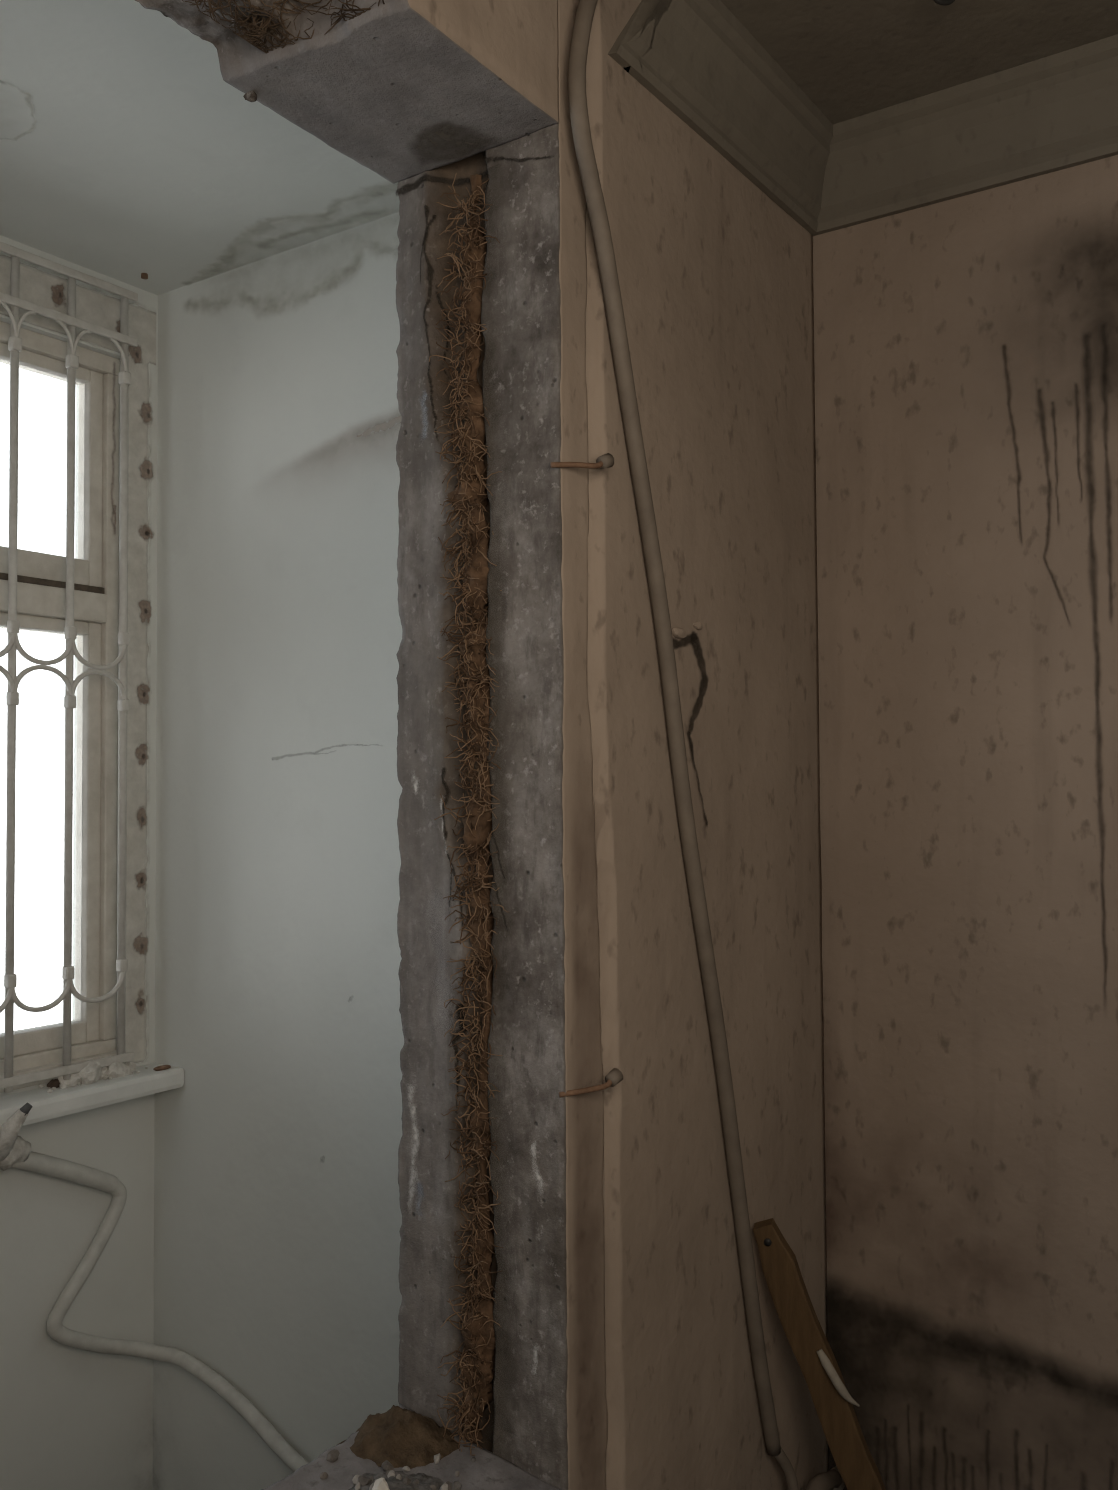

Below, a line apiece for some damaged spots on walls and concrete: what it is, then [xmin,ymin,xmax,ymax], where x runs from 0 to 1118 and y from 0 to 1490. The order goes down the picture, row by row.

crack [442,768,507,928]
crack [452,1004,467,1113]